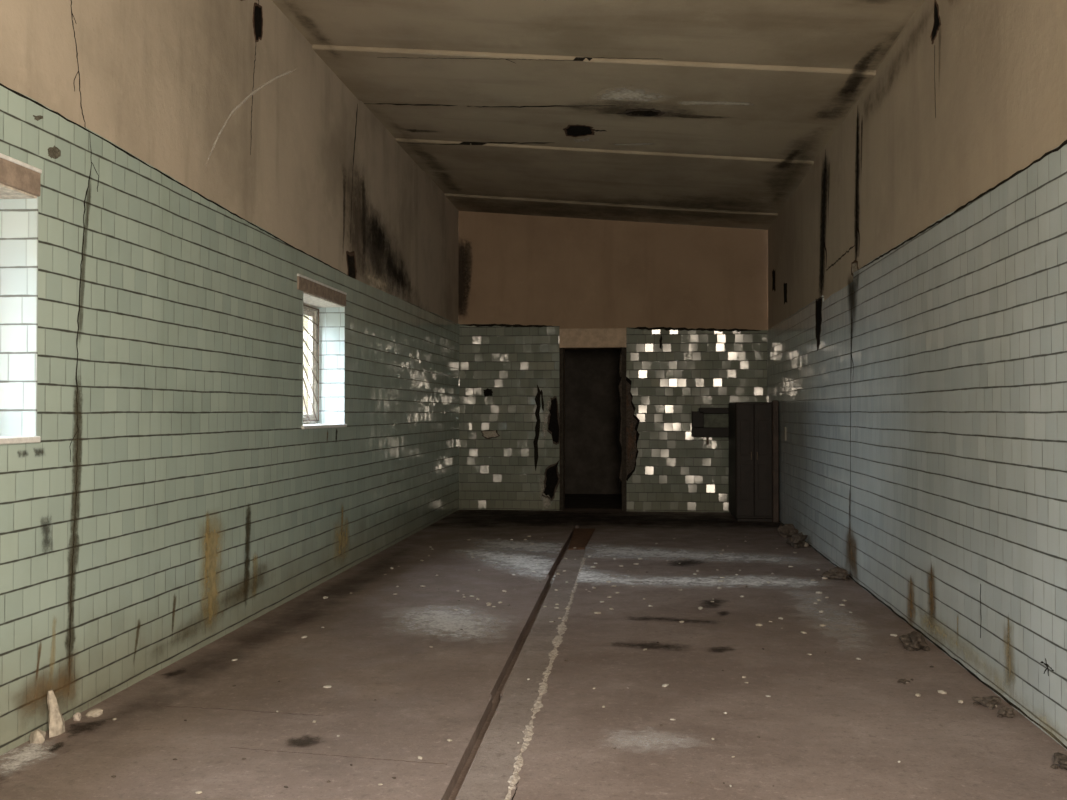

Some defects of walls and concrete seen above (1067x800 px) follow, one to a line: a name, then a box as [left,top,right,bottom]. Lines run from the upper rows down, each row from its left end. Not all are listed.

water stain [854,113,862,256]
water stain [819,161,830,293]
crack [0,0,352,696]
water stain [848,280,856,359]
spalling [544,396,560,445]
spalling [617,352,640,483]
spalling [542,461,560,506]
corrosion [847,493,857,575]
corrosion [926,565,945,636]
crack [805,541,1067,749]
corrosion [1005,619,1013,681]